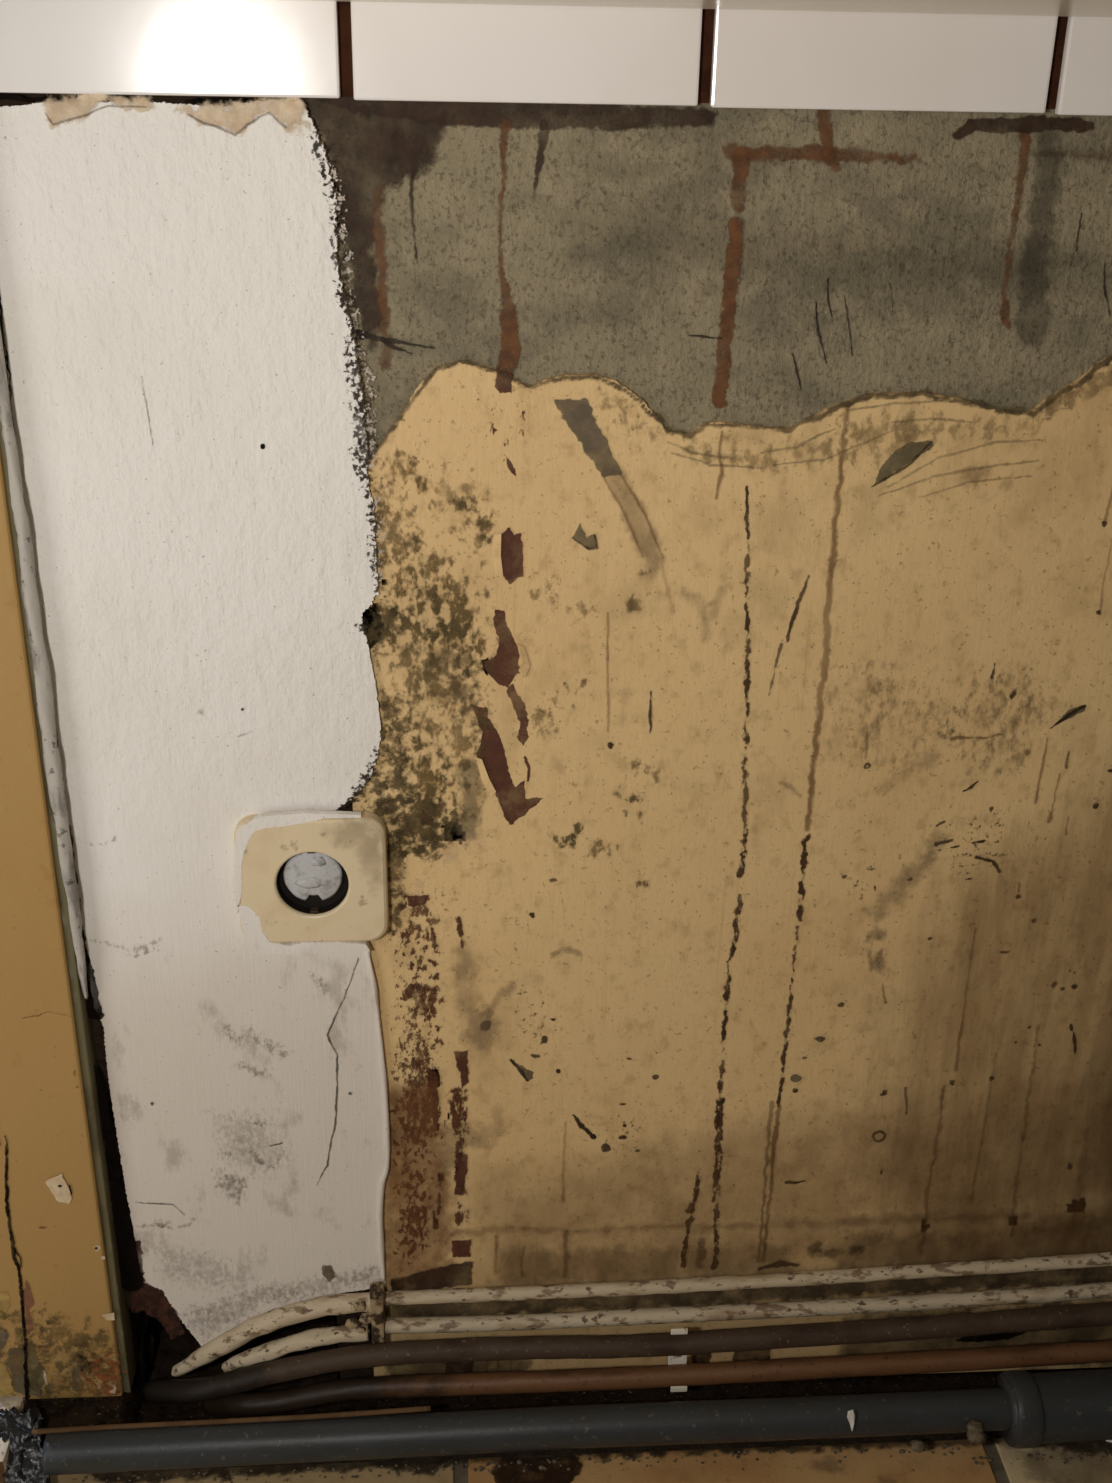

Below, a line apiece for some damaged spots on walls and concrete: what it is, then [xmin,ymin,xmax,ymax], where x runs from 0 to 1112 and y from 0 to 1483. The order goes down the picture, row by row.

damp [303,98,445,344]
rust [307,97,717,200]
spalling [176,98,1112,593]
rust [712,110,916,408]
rust [952,115,1094,219]
flaking render [337,746,379,811]
damp [360,451,502,940]
peeling [470,610,543,825]
crack [320,959,358,1178]
rust [384,891,473,1291]
peeling [509,985,556,1081]
crack [4,1136,30,1400]